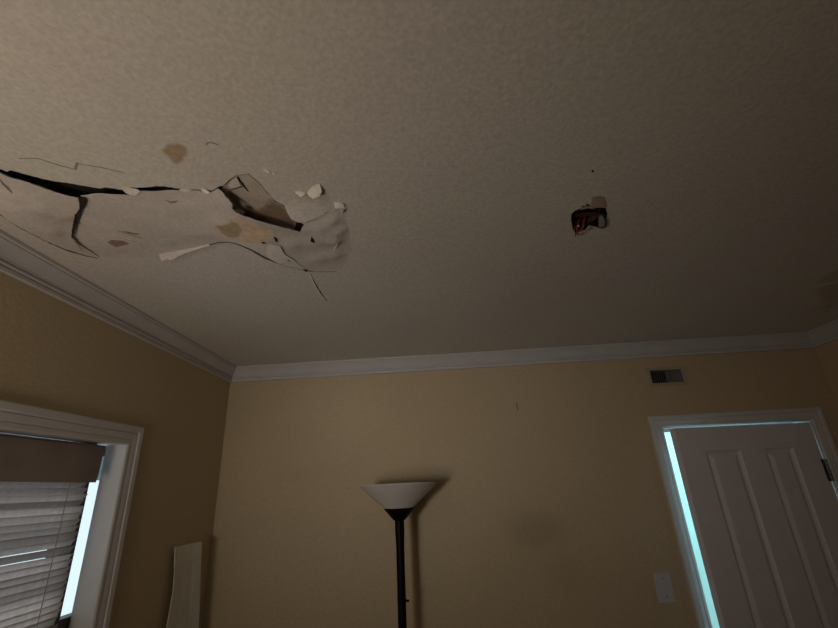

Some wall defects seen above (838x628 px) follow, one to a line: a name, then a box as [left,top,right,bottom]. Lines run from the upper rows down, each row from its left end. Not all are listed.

crack [0,158,222,251]
spalling [223,173,304,232]
peeling [295,184,322,199]
damp [212,215,275,245]
hole [571,208,607,233]
peeling [159,242,227,261]